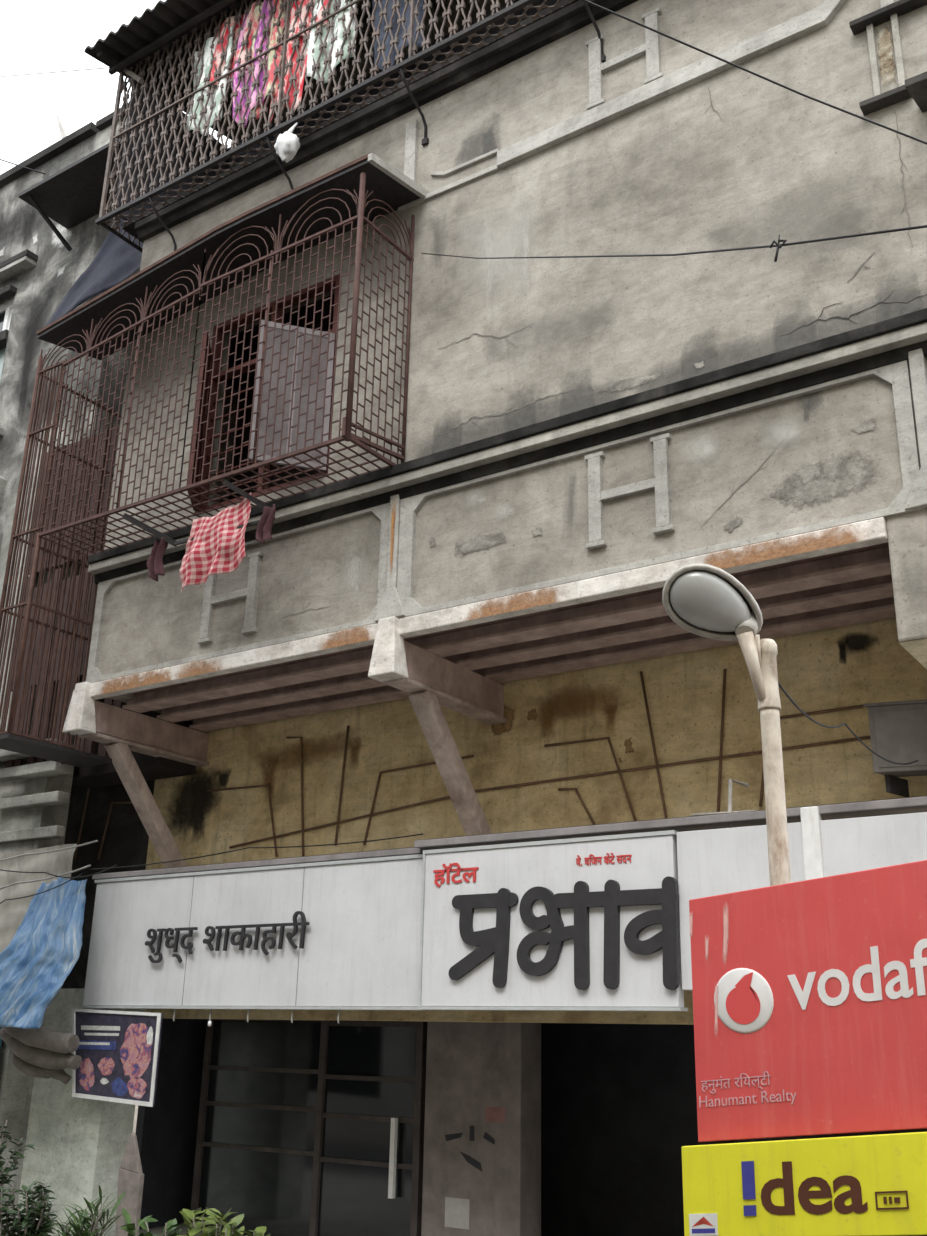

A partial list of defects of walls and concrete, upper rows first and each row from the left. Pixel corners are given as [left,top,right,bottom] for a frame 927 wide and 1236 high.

crack [894,110,912,252]
crack [779,251,927,337]
crack [438,323,534,349]
spalling [771,452,874,509]
spalling [723,517,743,532]
rust [707,531,856,569]
rust [469,591,554,620]
rust [102,663,219,694]
damp [193,771,230,835]